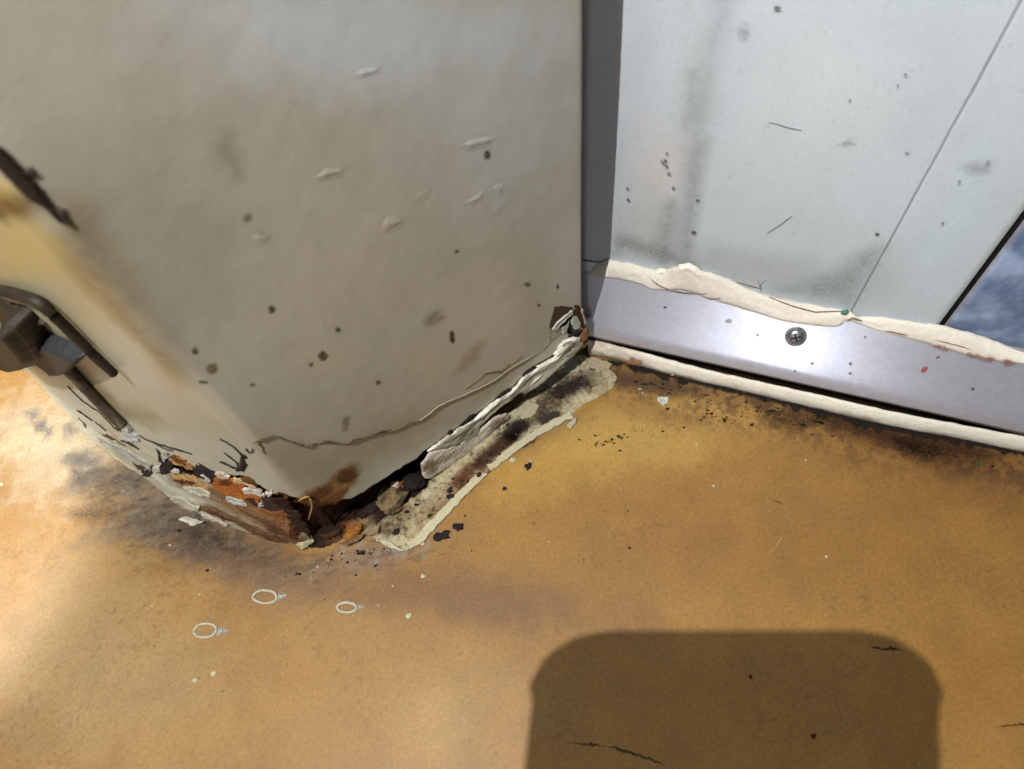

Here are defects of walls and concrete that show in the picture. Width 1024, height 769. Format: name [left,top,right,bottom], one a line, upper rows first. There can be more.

spalling [0,147,73,229]
peeling [97,429,229,527]
peeling [226,496,263,507]
rust [166,425,460,544]
crack [219,327,562,472]
peeling [373,308,617,551]